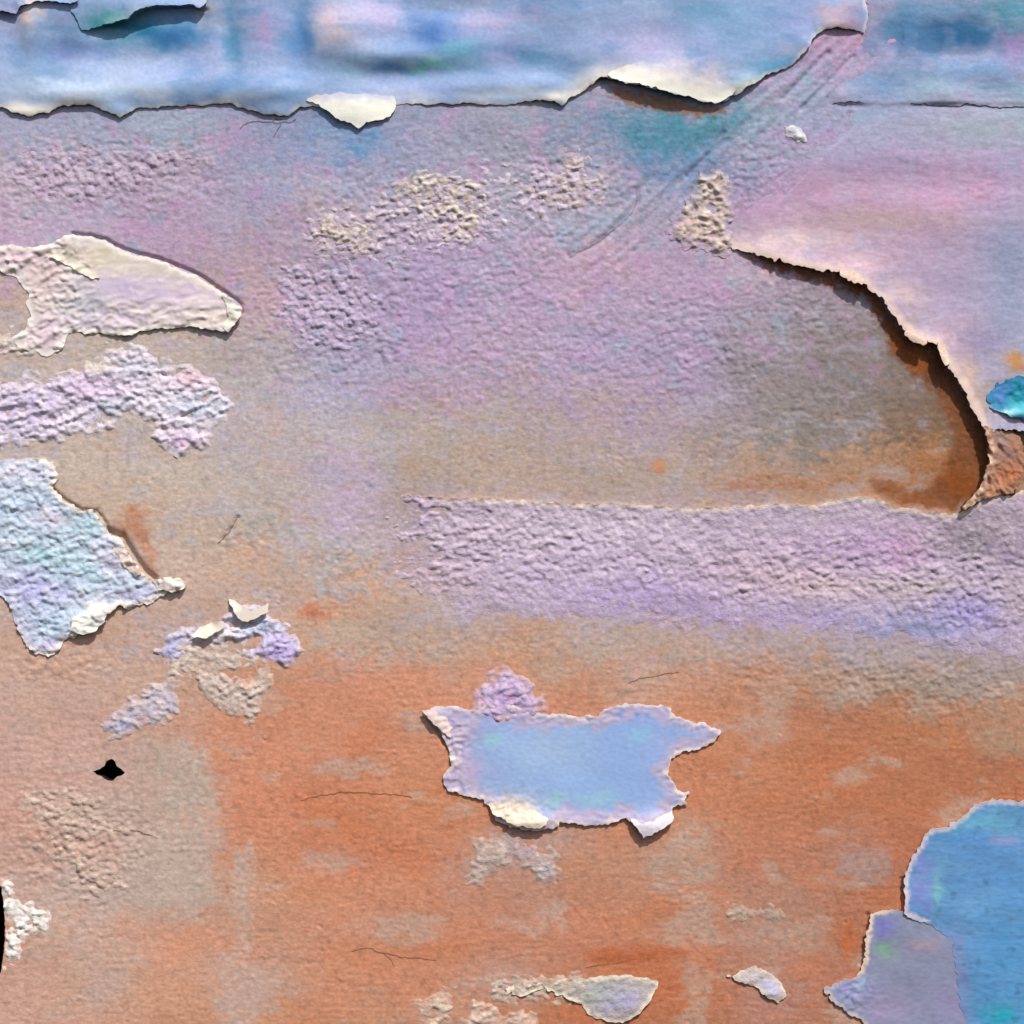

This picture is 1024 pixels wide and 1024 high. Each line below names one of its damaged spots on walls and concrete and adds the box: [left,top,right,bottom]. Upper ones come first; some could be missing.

peeling [0,0,1024,667]
rust [745,252,988,511]
peeling [99,599,305,742]
peeling [422,664,721,887]
peeling [410,970,658,1024]
peeling [726,965,787,1003]
peeling [823,798,1024,1024]